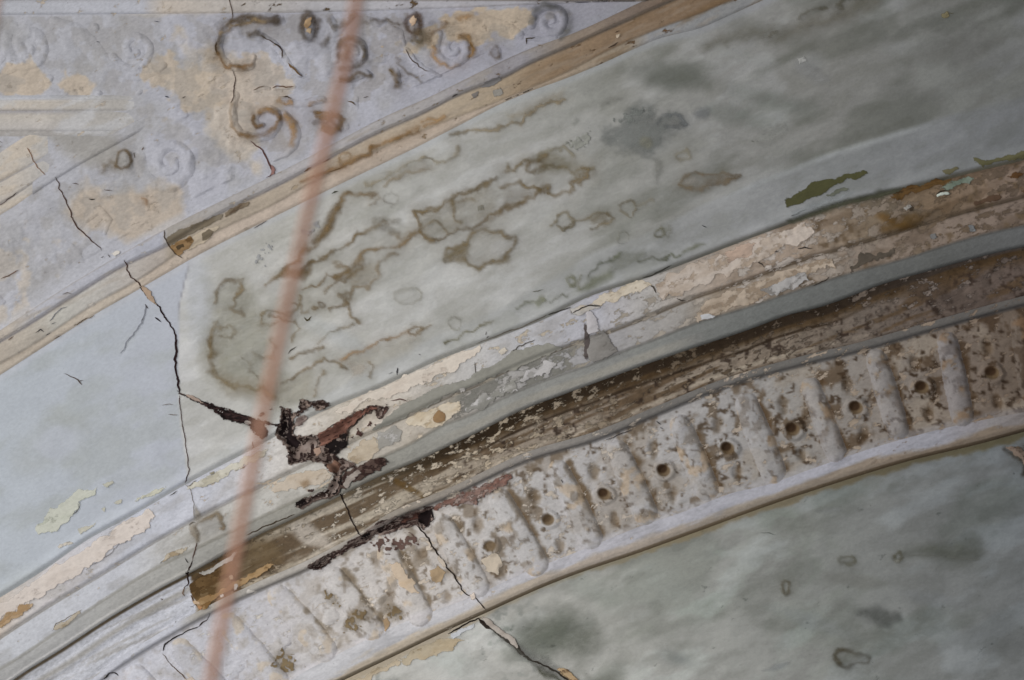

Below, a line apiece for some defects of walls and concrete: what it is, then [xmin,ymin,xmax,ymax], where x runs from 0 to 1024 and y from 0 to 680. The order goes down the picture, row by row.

leakage [452,99,565,157]
leakage [507,131,591,196]
leakage [606,107,687,153]
leakage [275,177,398,328]
leakage [398,179,523,271]
crack [0,141,280,515]
flaking render [271,334,566,510]
peeling [0,449,268,620]
crack [339,492,360,535]
peeling [53,610,81,630]
crack [416,525,578,680]